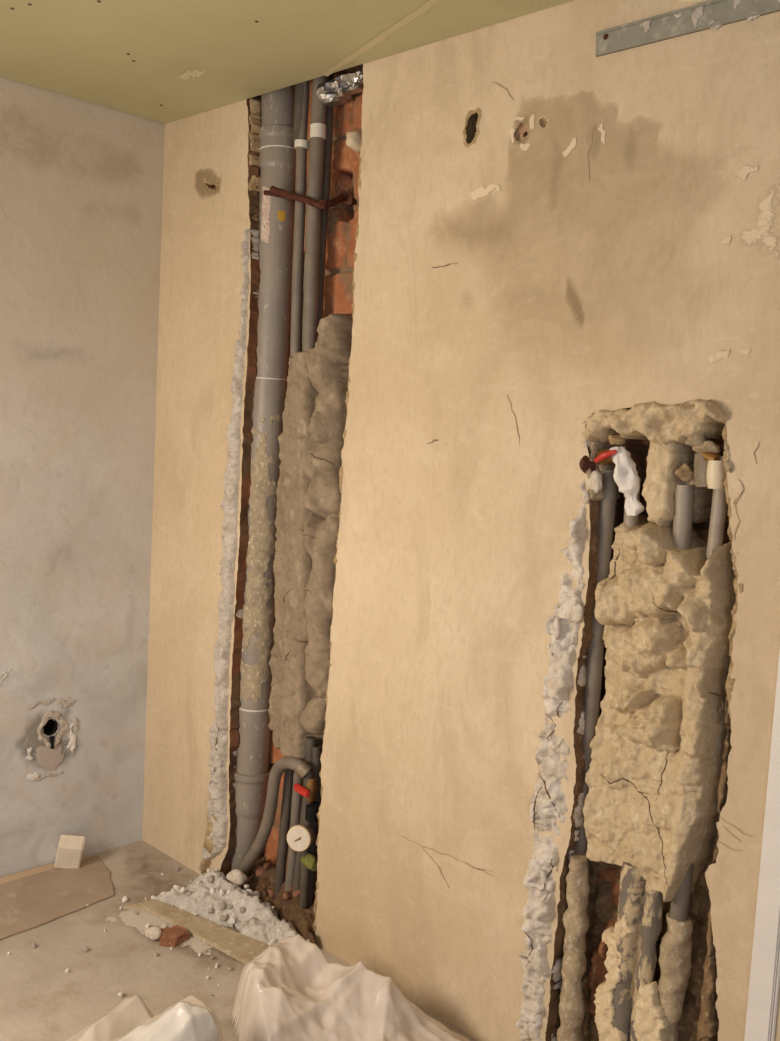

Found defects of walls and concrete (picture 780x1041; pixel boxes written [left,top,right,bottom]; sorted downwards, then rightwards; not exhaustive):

flaking render [463,108,482,148]
flaking render [509,114,548,151]
flaking render [721,178,780,260]
flaking render [25,696,79,782]
crack [401,836,495,888]